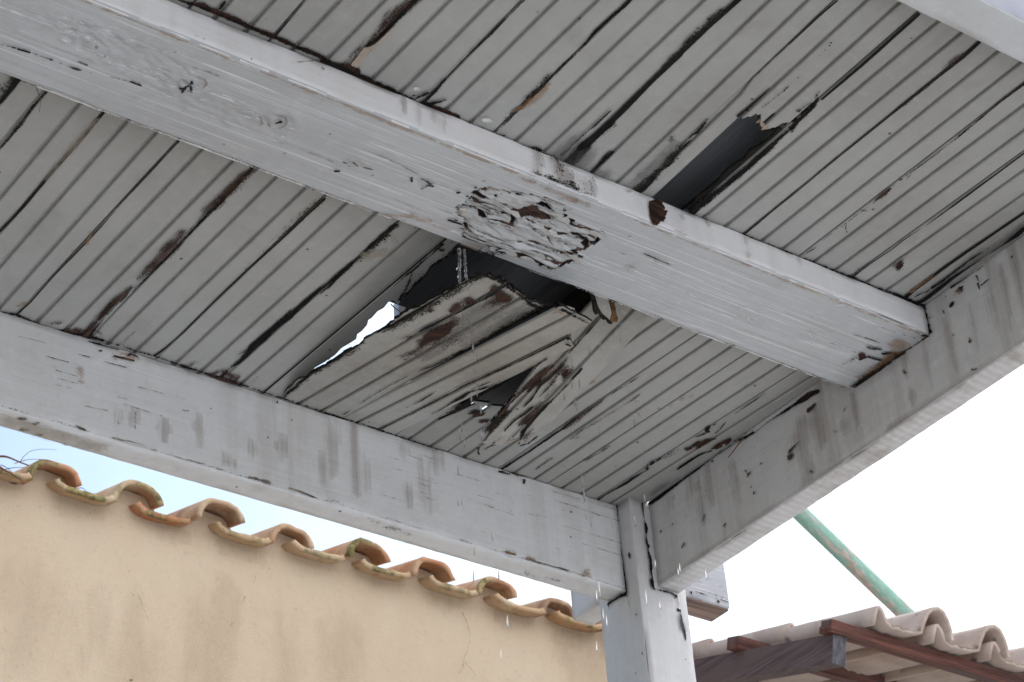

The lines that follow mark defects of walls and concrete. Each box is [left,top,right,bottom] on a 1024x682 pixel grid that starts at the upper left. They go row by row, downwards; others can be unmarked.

leakage [0,167,599,461]
crack [485,358,568,441]
peeling [518,365,574,442]